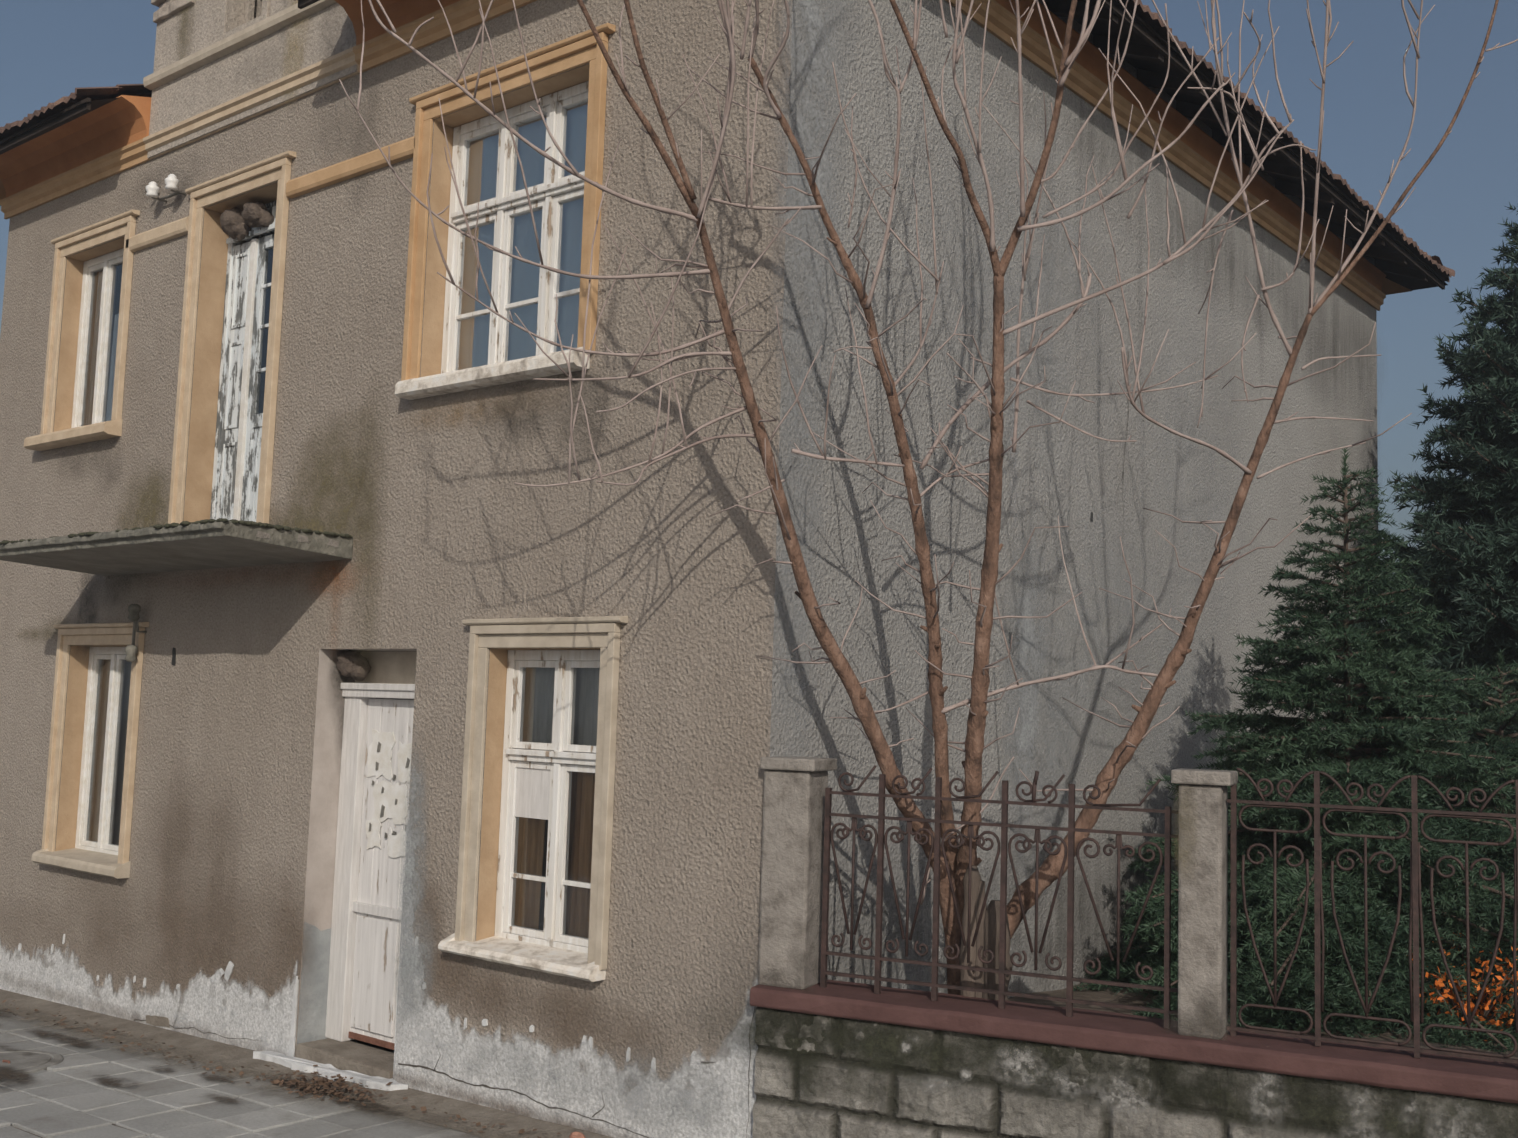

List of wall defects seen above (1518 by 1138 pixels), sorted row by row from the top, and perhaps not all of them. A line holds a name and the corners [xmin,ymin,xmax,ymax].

peeling [0,934,299,1057]
peeling [393,769,758,1138]